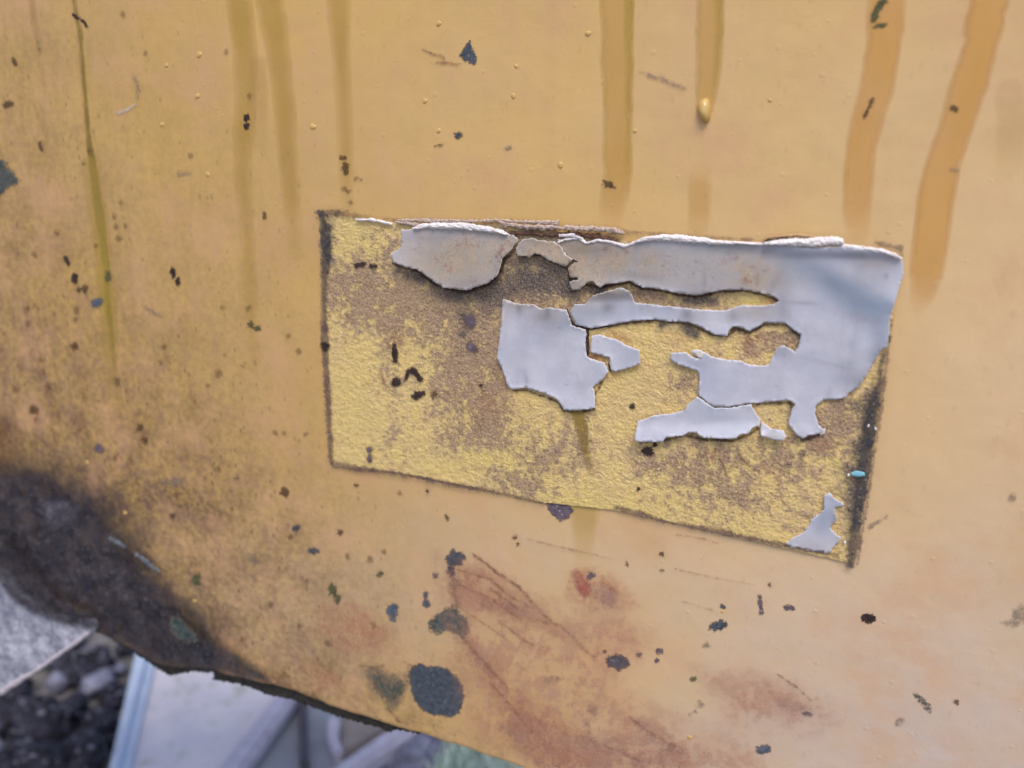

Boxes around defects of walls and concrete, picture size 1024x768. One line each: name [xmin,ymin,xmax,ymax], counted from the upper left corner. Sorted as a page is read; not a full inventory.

damp [868,8,900,96]
damp [915,0,1005,277]
peeling [390,228,904,456]
peeling [546,503,573,522]
peeling [786,492,844,554]